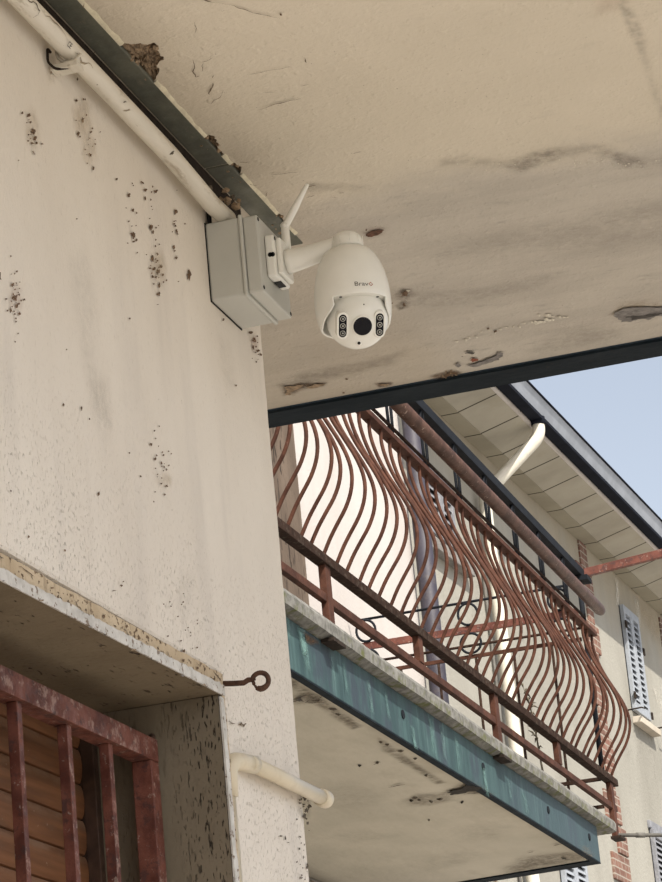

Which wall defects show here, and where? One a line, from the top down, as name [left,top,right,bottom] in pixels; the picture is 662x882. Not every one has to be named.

peeling [455,314,568,367]
spalling [613,307,662,322]